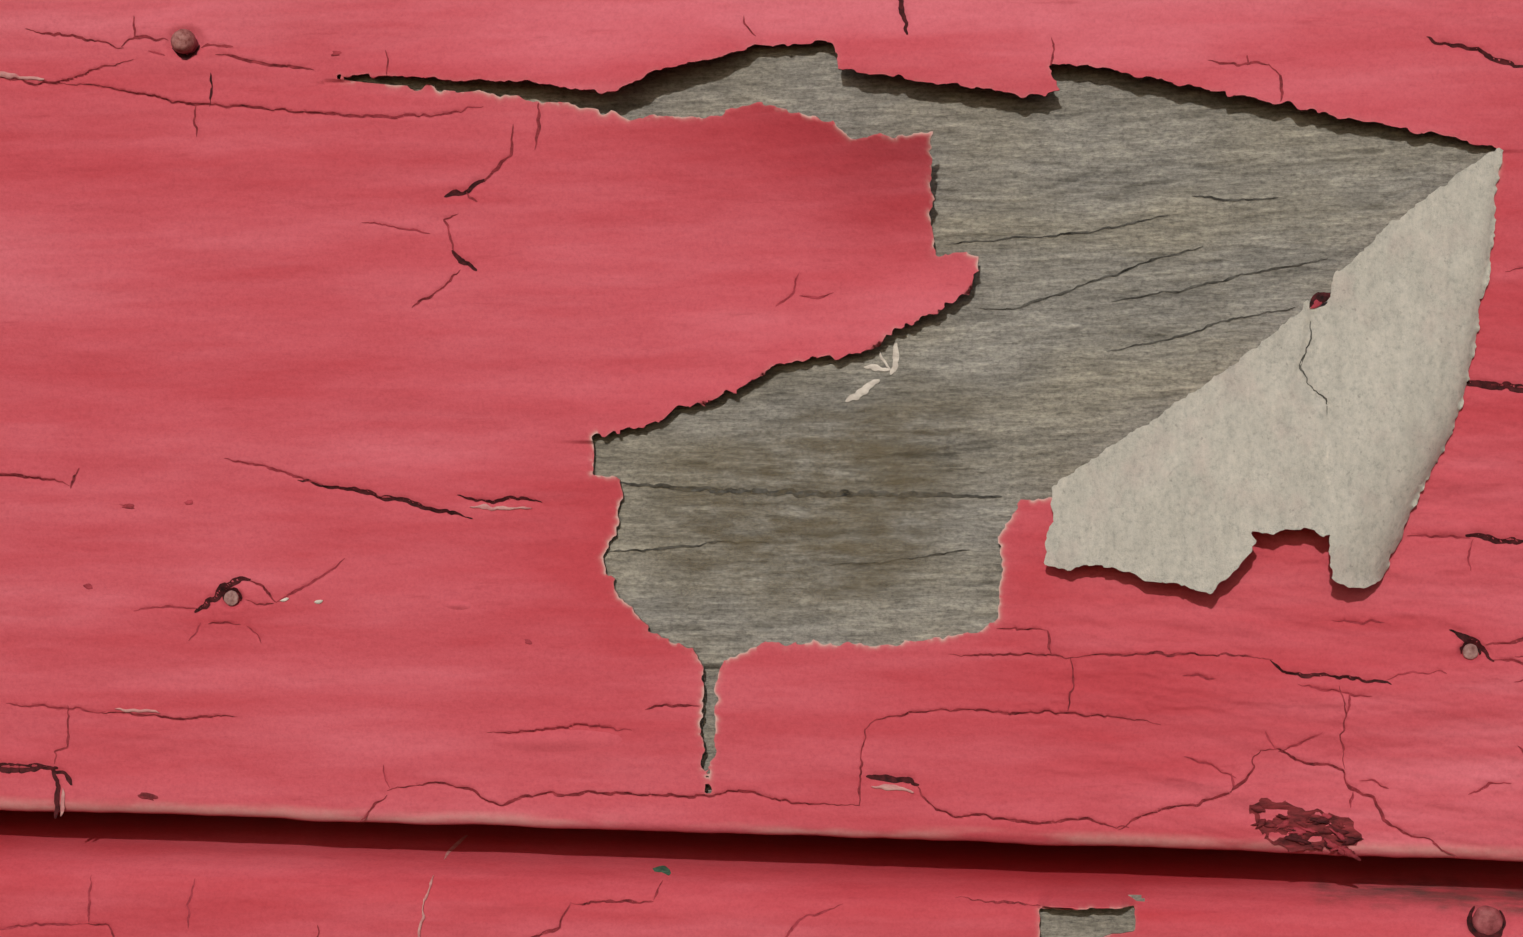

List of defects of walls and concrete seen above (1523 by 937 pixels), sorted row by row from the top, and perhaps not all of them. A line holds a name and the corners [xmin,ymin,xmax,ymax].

crack [0,17,483,136]
crack [898,0,908,35]
crack [1427,36,1523,68]
crack [362,103,541,307]
peeling [331,0,1504,793]
crack [0,468,79,489]
crack [224,458,541,519]
crack [134,558,345,643]
crack [0,703,235,819]
crack [360,627,1523,858]
spalling [1249,798,1363,861]
peeling [1039,895,1145,937]